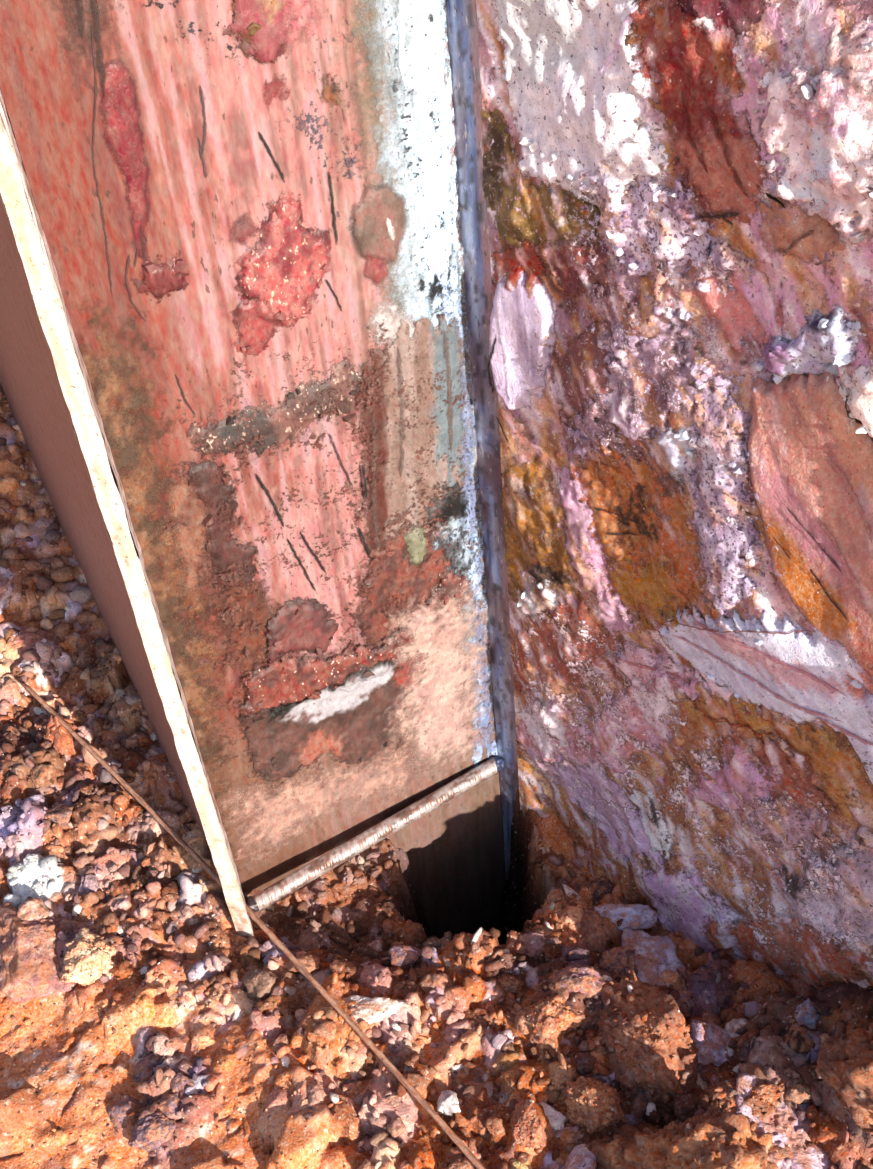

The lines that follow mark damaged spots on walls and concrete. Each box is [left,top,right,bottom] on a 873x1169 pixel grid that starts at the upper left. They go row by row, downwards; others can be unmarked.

peeling [224,0,321,63]
rust [100,60,189,303]
peeling [229,192,331,327]
water stain [79,0,498,865]
water stain [492,0,873,992]
spalling [266,597,339,664]
spalling [239,653,407,788]